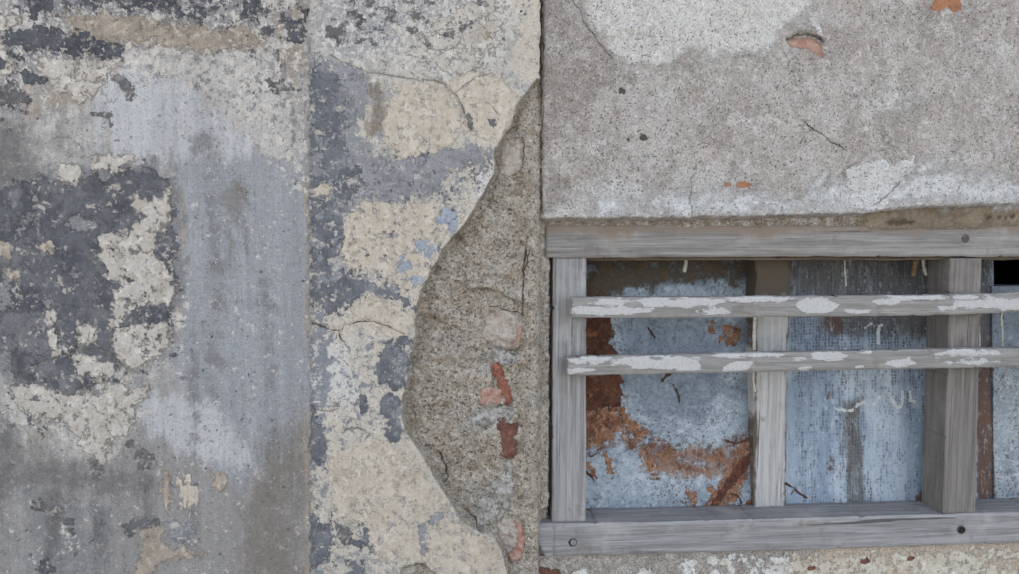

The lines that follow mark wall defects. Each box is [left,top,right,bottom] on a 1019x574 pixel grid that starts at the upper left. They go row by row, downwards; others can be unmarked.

spalling [930,0,962,12]
spalling [786,21,824,58]
spalling [0,0,590,574]
rust [585,318,618,355]
rust [706,320,744,350]
rust [586,374,752,507]